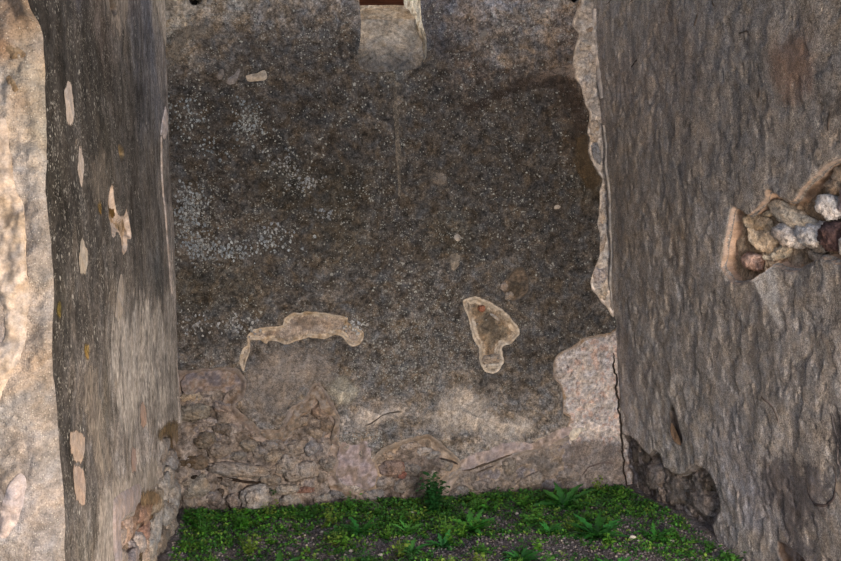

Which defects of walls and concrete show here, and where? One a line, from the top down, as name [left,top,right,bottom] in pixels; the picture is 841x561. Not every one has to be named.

spalling [108,185,131,255]
peeling [160,107,168,139]
spalling [217,69,267,85]
flaking render [572,0,615,317]
flaking render [720,158,841,285]
spalling [463,267,529,374]
flaking render [113,311,720,561]
crack [582,353,627,486]